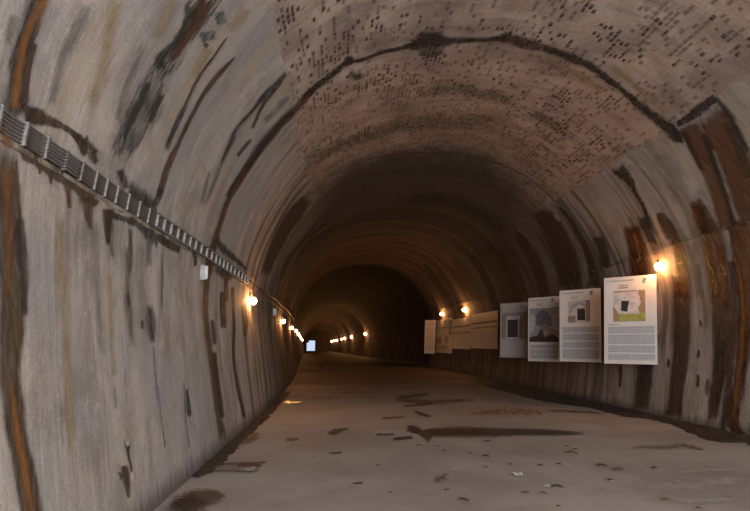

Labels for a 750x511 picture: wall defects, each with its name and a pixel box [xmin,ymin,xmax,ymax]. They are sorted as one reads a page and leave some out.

corrosion [3,0,46,117]
water stain [165,37,228,149]
crack [302,32,748,152]
corrosion [0,125,113,511]
water stain [111,212,181,336]
water stain [141,308,155,360]
corrosion [625,213,691,416]
corrosion [681,110,750,434]